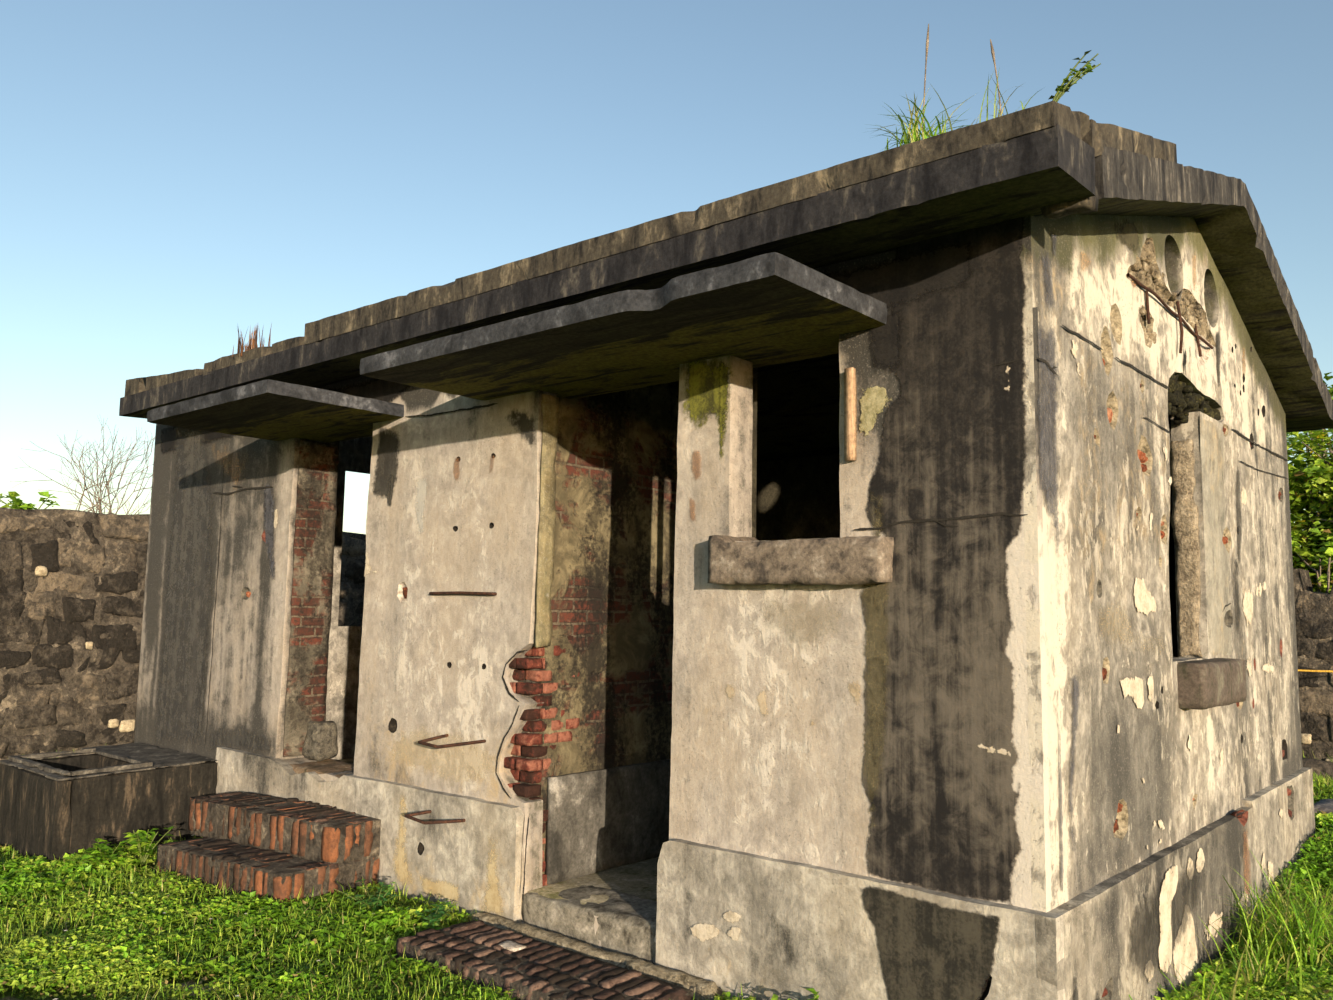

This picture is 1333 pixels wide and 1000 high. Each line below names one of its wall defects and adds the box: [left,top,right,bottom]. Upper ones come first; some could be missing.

flaking render [1127,238,1252,366]
leakage [328,378,410,403]
leakage [683,360,732,457]
leakage [263,485,275,580]
leakage [155,426,271,753]
leakage [824,217,1059,1000]
flaking render [1133,577,1156,615]
flaking render [1102,657,1163,709]
flaking render [1145,848,1223,987]